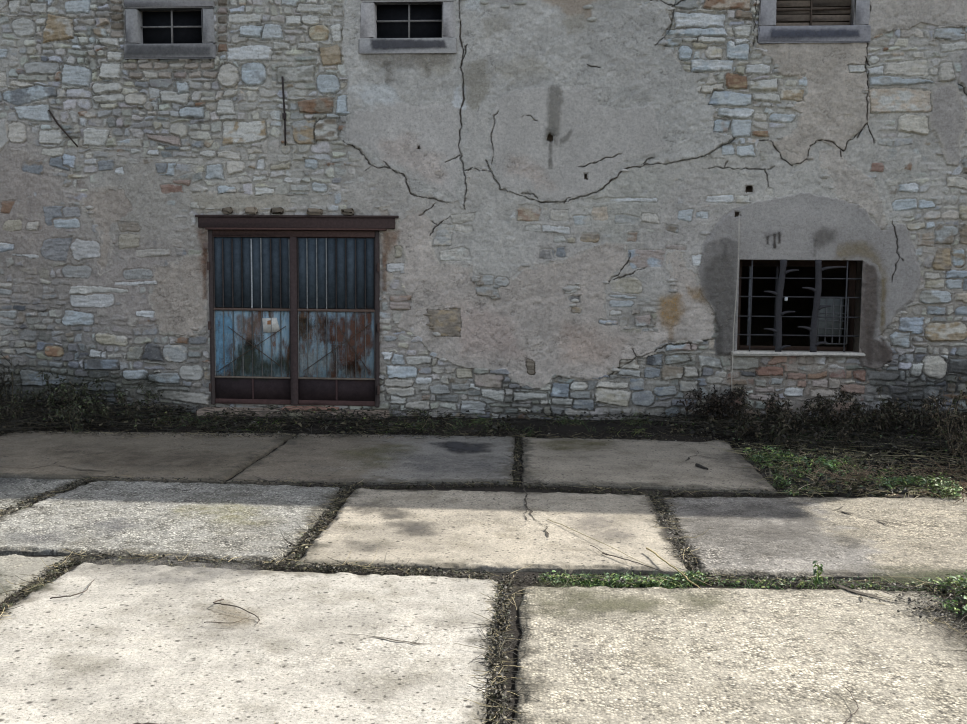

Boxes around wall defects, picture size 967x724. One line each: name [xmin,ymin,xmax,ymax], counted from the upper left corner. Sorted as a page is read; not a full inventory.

crack [343,0,498,230]
flaking render [0,0,967,421]
water stain [548,86,562,166]
crack [521,156,683,203]
crack [705,43,874,187]